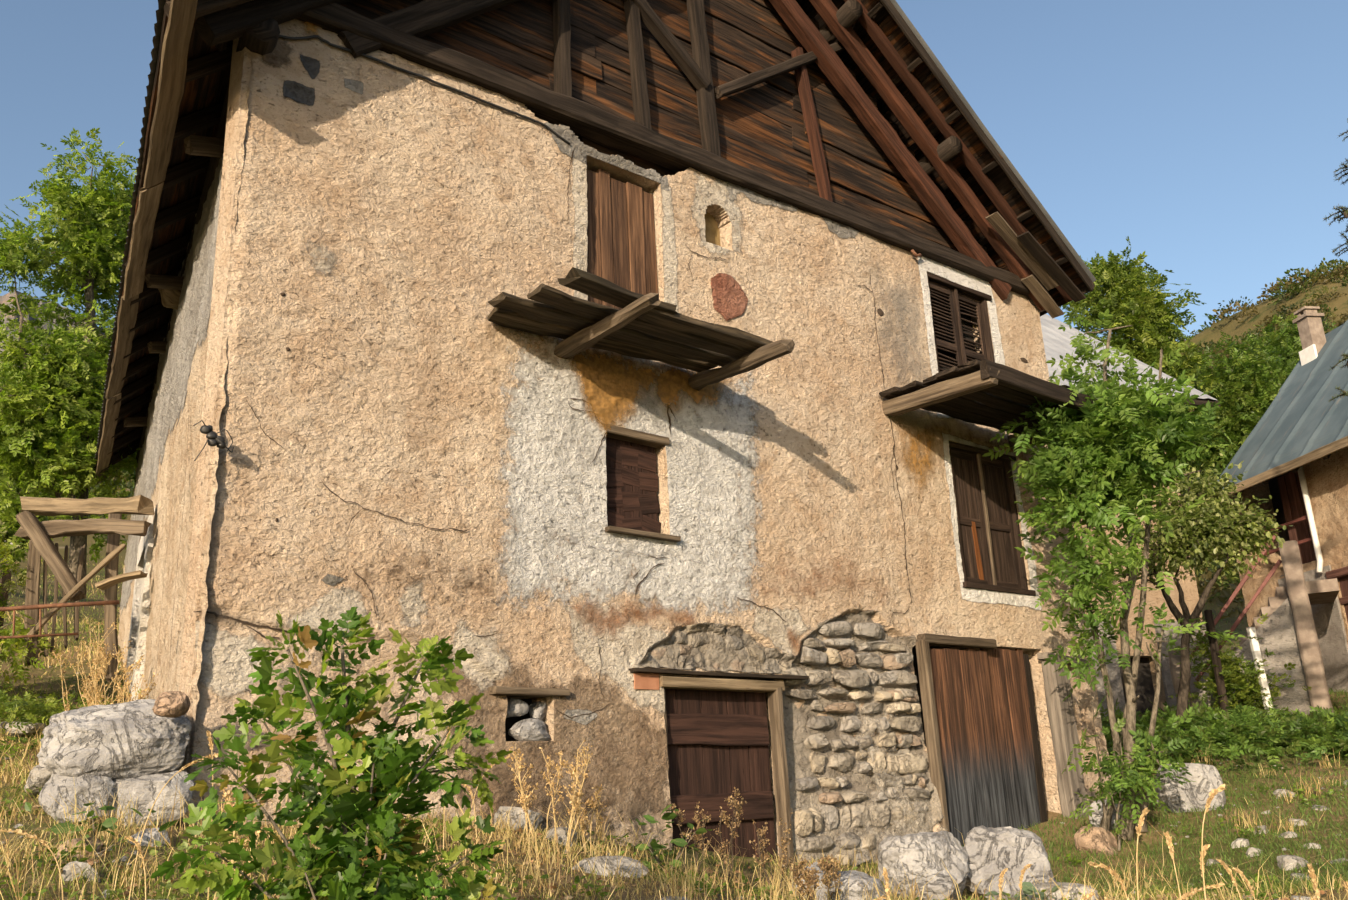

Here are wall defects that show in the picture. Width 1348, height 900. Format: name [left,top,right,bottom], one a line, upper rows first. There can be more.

leakage [570,349,722,430]
crack [853,283,912,627]
crack [322,481,467,532]
peeling [195,621,264,698]